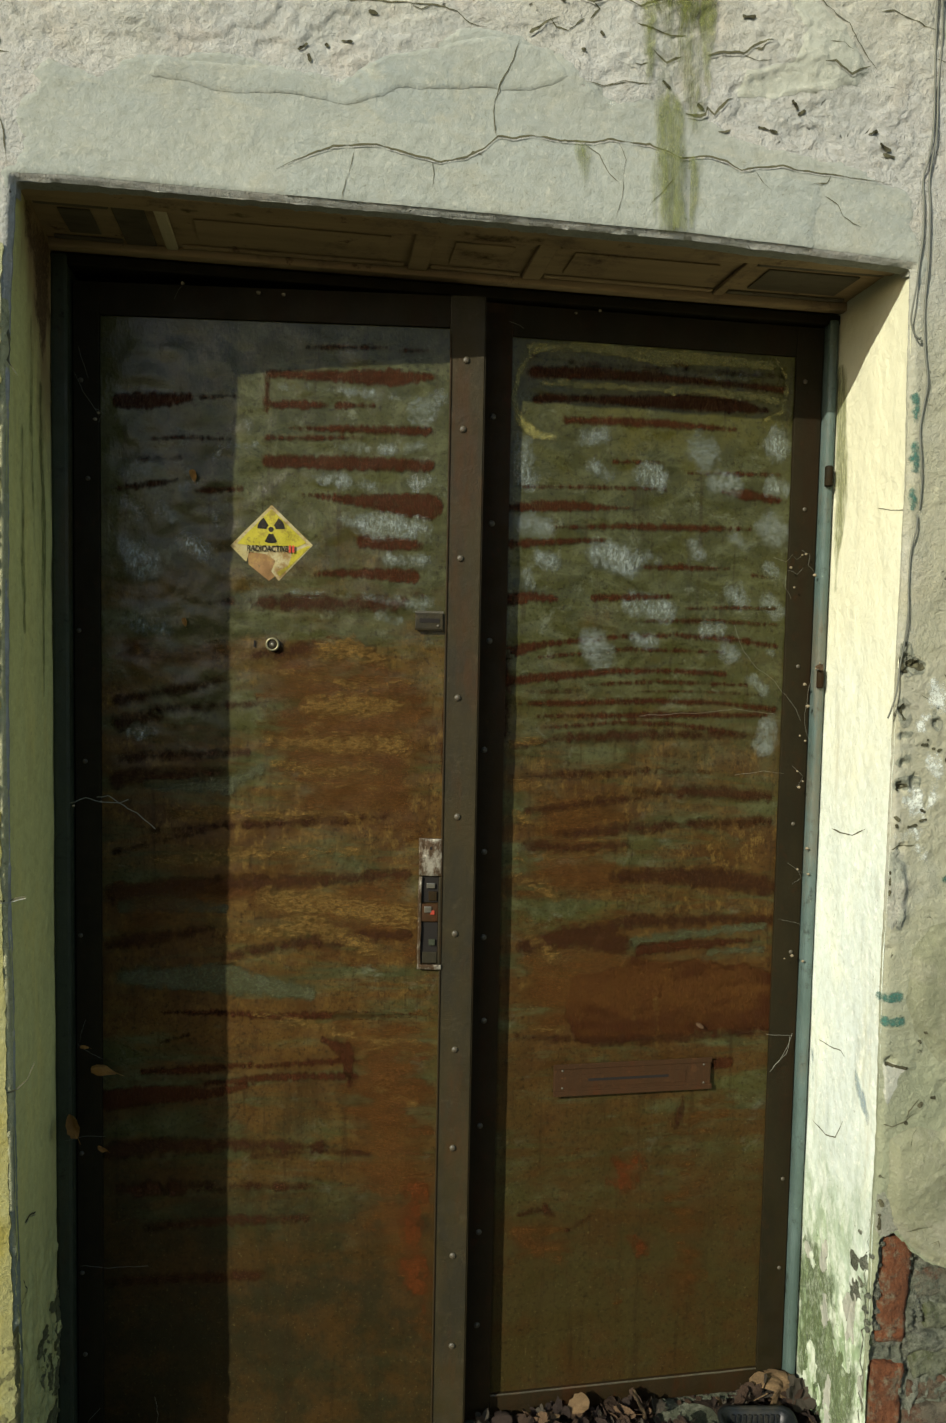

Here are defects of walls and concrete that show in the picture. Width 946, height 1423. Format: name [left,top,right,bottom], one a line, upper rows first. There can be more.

crack [823,0,946,77]
crack [276,0,892,227]
leakage [645,0,716,229]
rust [262,348,434,473]
rust [528,354,788,431]
rust [308,493,443,521]
rust [508,484,751,549]
rust [504,606,777,747]
spalling [899,641,926,677]
spalling [893,698,946,792]
spalling [0,242,62,1423]
spalling [798,1192,946,1423]